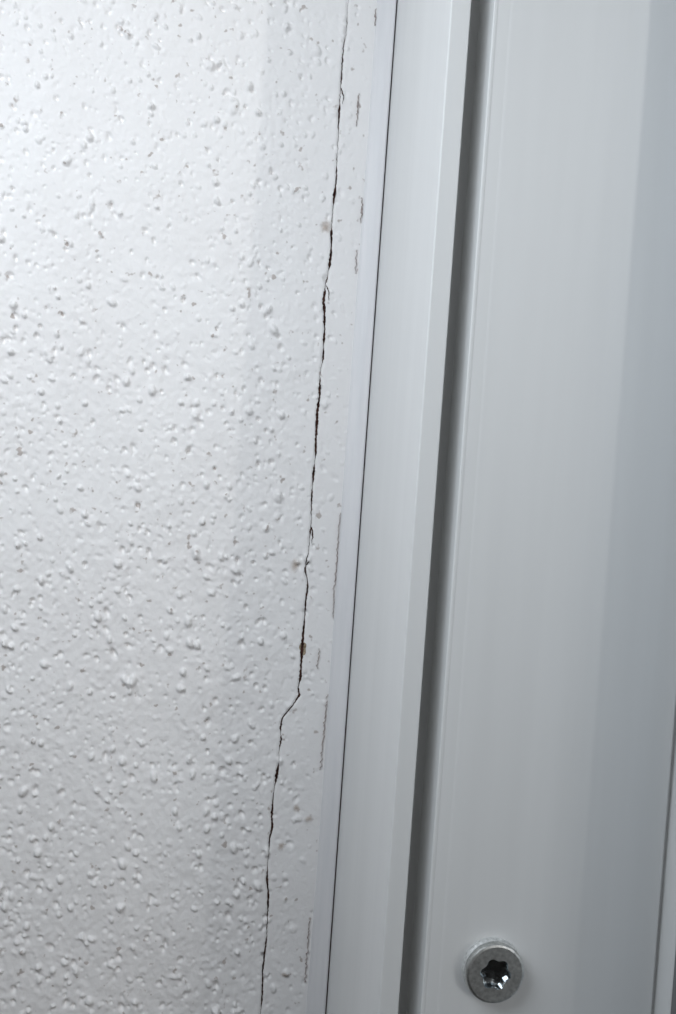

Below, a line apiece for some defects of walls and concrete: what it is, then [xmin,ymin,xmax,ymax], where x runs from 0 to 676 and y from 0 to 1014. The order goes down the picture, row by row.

crack [260,12,359,1013]